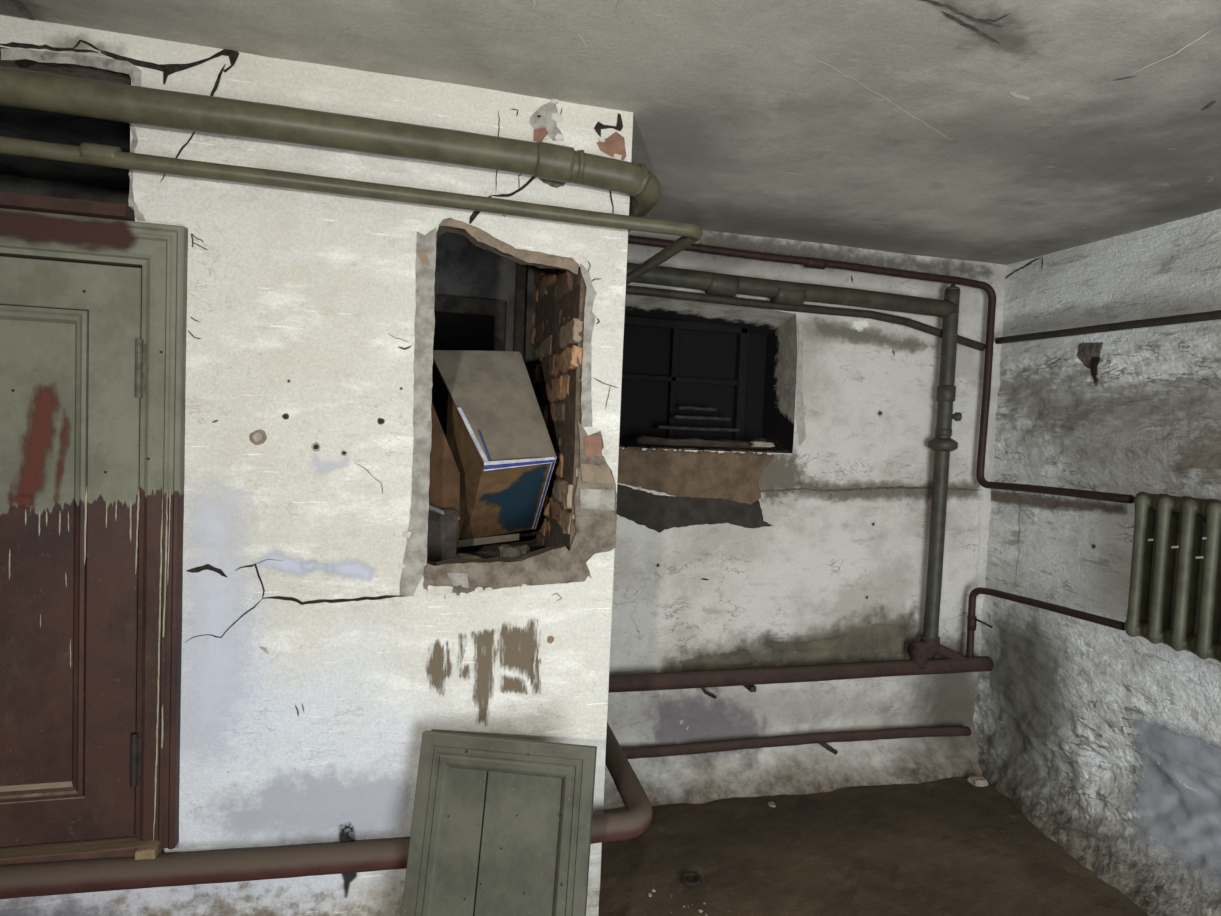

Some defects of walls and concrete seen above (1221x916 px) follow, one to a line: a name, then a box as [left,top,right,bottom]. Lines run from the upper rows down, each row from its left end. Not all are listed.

crack [920,0,1010,44]
crack [210,65,225,96]
crack [160,131,195,182]
spalling [399,218,774,598]
crack [186,559,403,642]
water stain [662,607,916,673]
water stain [657,700,758,755]
water stain [986,621,1062,794]
water stain [145,886,274,916]